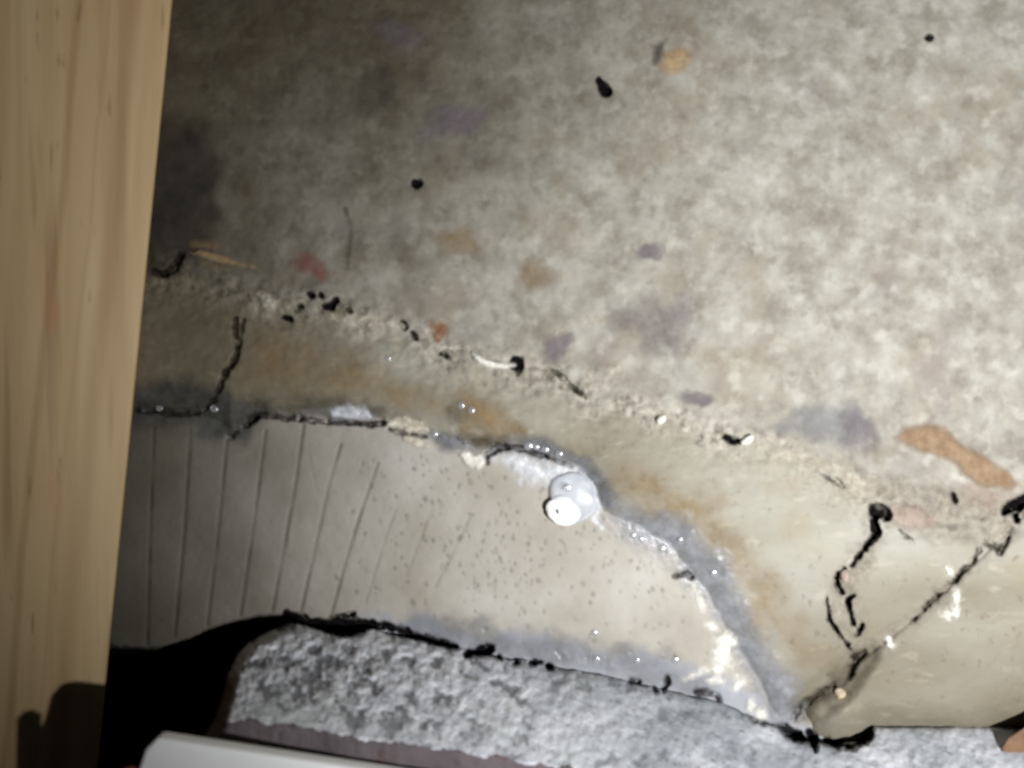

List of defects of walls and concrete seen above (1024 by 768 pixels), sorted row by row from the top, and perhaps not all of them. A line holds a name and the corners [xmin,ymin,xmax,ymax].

crack [150,253,184,277]
crack [135,317,246,416]
crack [1002,495,1024,523]
leakage [387,416,793,723]
crack [807,503,910,701]
crack [924,543,1003,611]
hole [98,616,283,768]